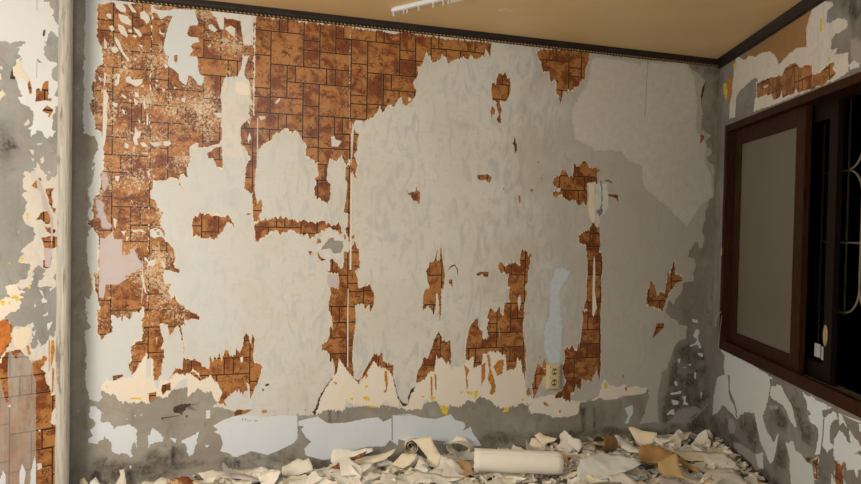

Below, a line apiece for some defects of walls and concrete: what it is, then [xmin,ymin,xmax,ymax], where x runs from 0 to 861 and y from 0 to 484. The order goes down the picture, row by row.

peeling [208,24,239,41]
peeling [104,1,186,155]
peeling [331,120,363,162]
spalling [316,230,350,260]
spalling [161,404,191,419]
peeling [822,411,861,453]